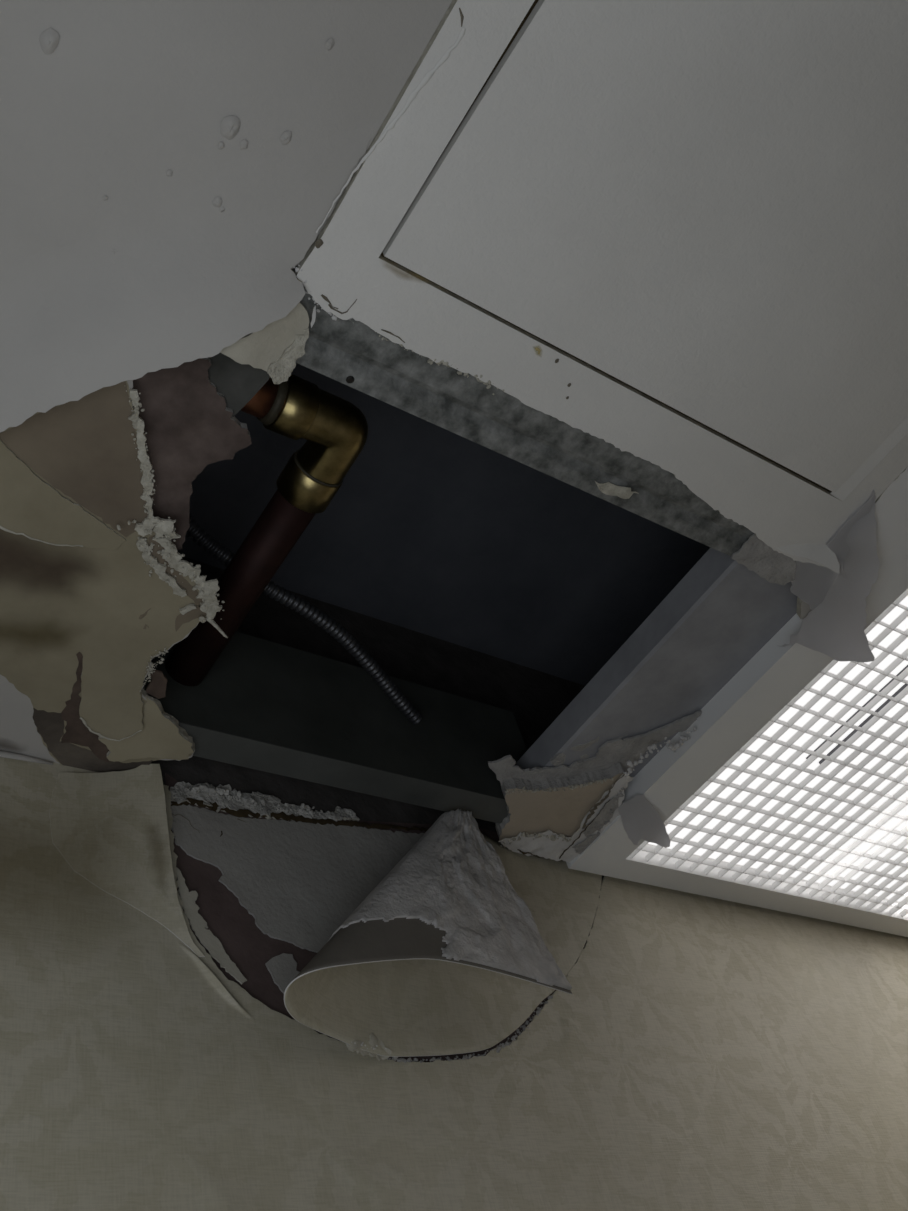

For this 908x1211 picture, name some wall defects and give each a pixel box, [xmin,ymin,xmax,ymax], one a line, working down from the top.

spalling [731,533,796,585]
peeling [0,381,620,1057]
spalling [488,710,702,786]